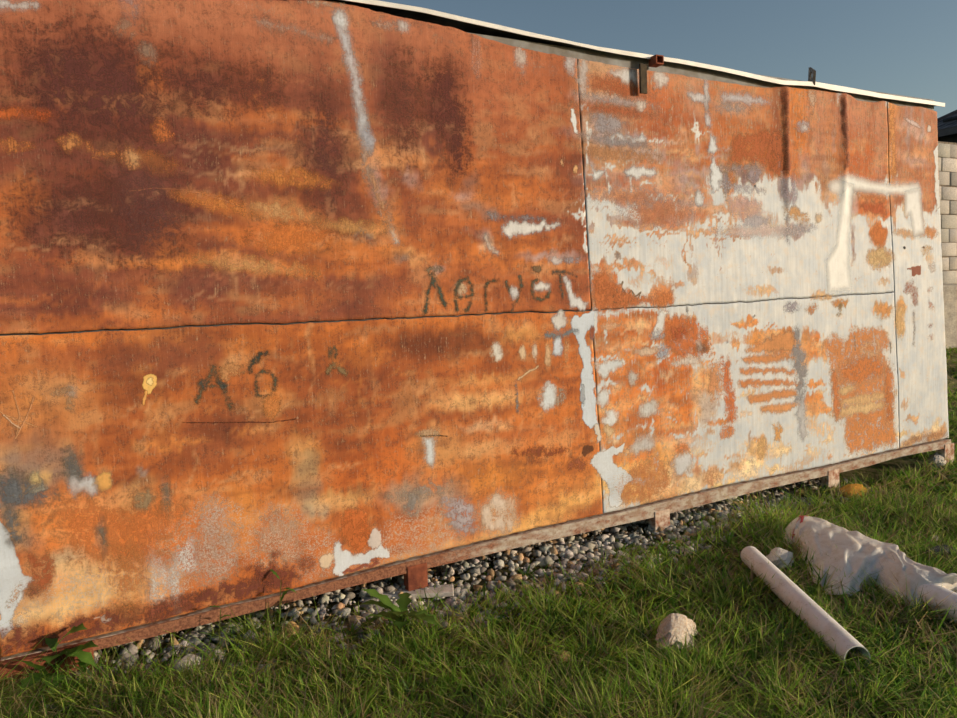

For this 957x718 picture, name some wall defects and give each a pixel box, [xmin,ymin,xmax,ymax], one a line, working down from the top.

peeling [611,68,638,87]
rust [0,21,393,275]
rust [386,50,471,175]
peeling [625,166,656,179]
peeling [689,80,723,206]
rust [719,130,786,197]
peeling [635,309,668,358]
peeling [637,399,659,418]
rust [568,445,594,471]
peeling [0,510,34,637]
rust [0,474,316,655]
rust [340,507,380,574]